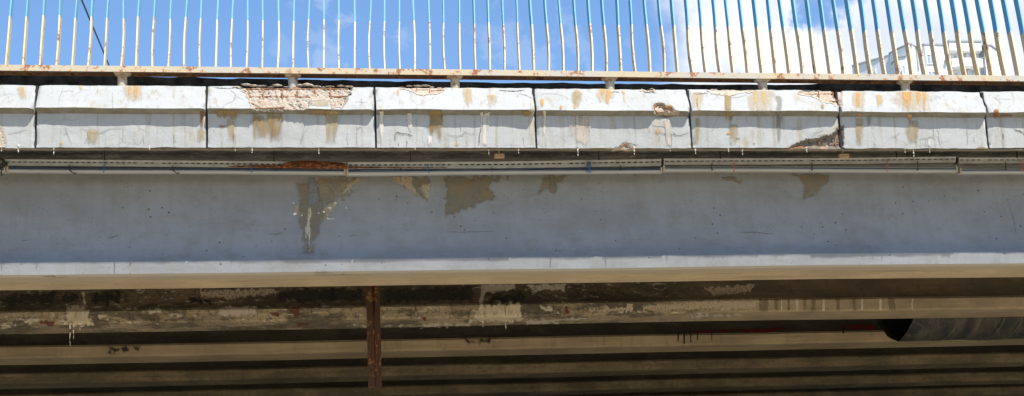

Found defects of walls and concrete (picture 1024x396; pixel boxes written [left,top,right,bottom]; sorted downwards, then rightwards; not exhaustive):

spalling [236,83,354,112]
spalling [640,88,682,126]
spalling [798,90,843,107]
water stain [253,114,282,138]
water stain [308,110,338,135]
water stain [428,110,443,144]
spalling [785,121,845,151]
rust [228,160,445,169]
water stain [297,183,325,254]
water stain [1,291,132,327]
water stain [385,283,840,343]